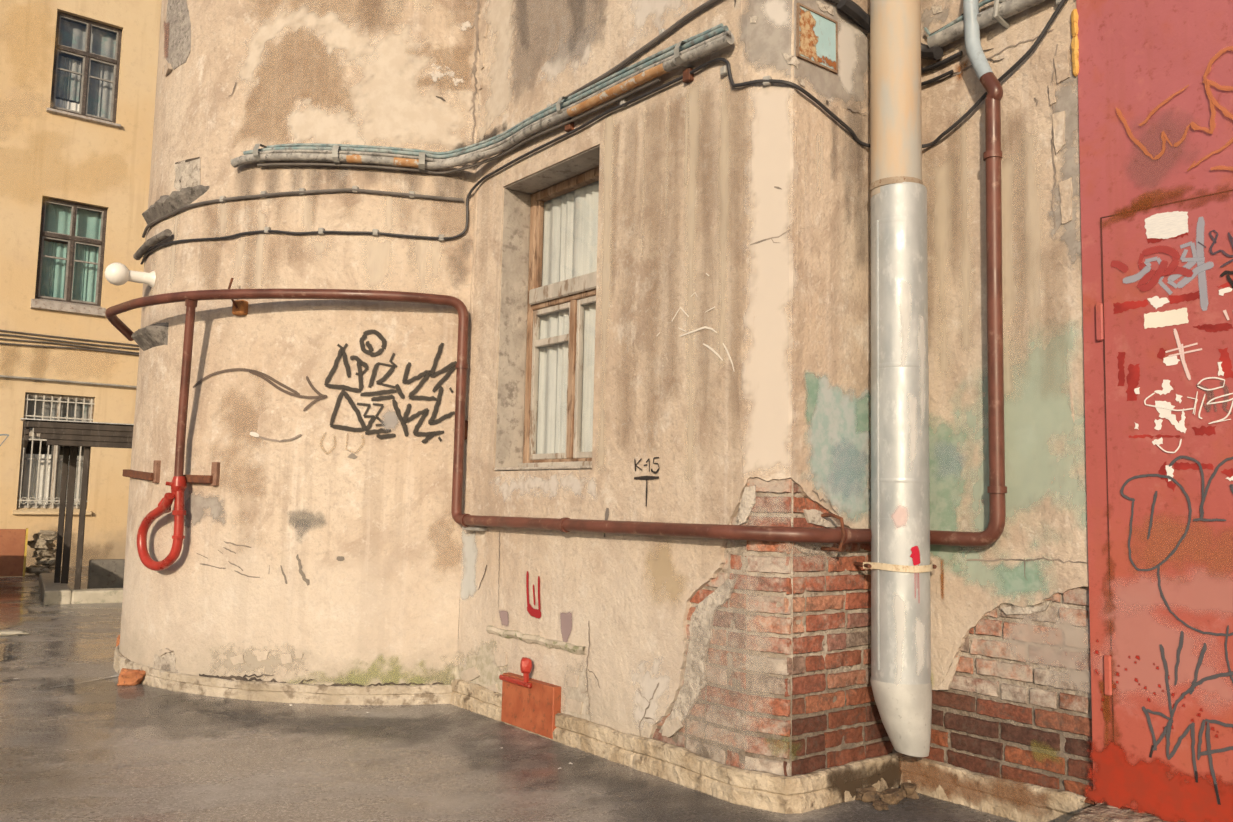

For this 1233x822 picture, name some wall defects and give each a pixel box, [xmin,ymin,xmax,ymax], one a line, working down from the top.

flaking render [240,0,515,150]
rust [799,8,836,70]
flaking render [1047,44,1082,262]
flaking render [633,477,1233,822]